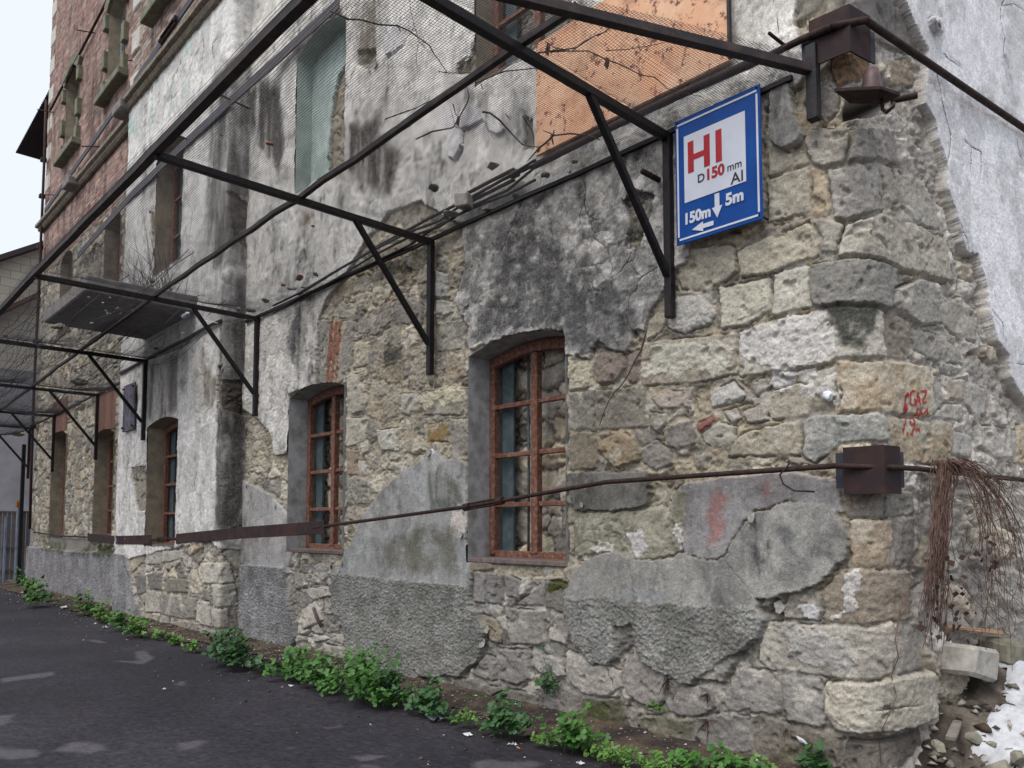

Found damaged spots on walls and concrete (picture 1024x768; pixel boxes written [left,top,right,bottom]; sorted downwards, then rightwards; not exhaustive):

water stain [359,2,377,61]
water stain [208,87,249,267]
water stain [248,80,284,168]
water stain [349,116,399,192]
crack [579,176,658,330]
water stain [204,280,246,529]
flaking render [216,364,288,511]
flaking render [286,199,480,660]
flaking render [464,0,1024,768]